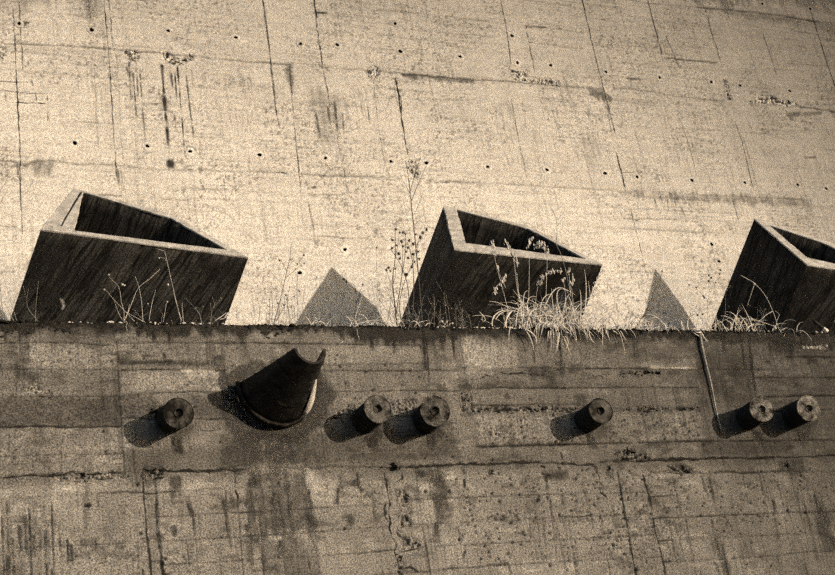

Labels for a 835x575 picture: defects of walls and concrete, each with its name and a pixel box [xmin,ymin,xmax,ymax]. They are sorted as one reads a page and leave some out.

leakage [161,64,194,144]
spalling [160,50,196,66]
spalling [510,68,560,87]
spalling [750,93,796,108]
leakage [219,359,336,464]
leakage [245,472,317,557]